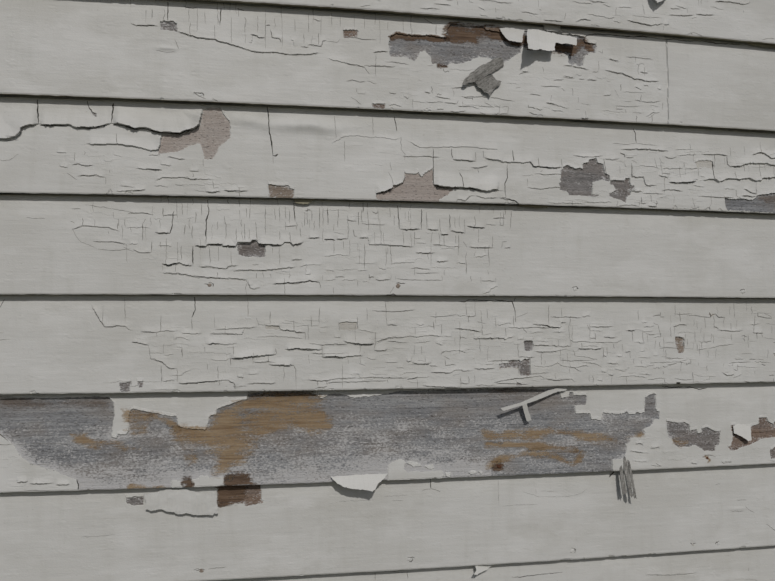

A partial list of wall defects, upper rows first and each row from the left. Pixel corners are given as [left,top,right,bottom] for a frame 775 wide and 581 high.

peeling [114,0,759,130]
peeling [0,96,775,301]
peeling [0,297,775,515]